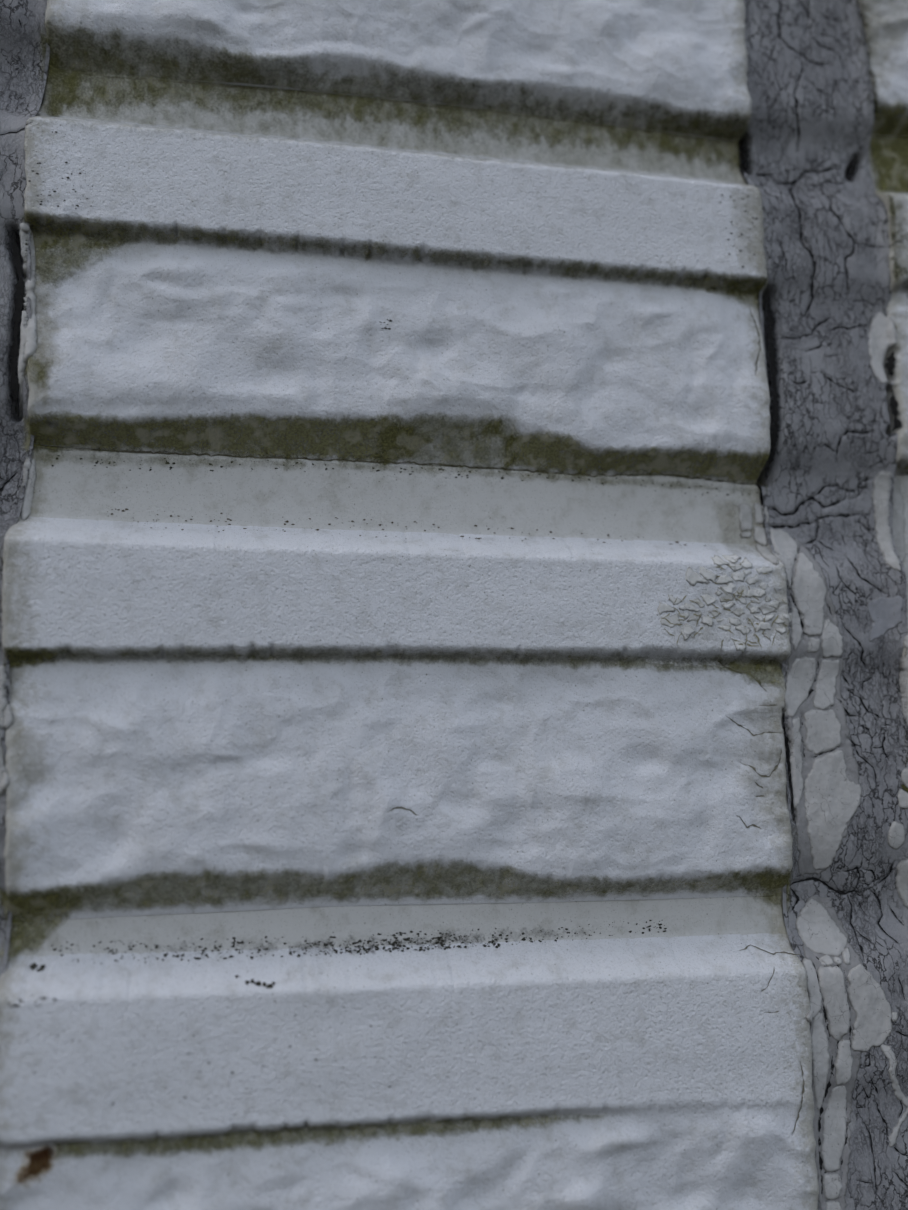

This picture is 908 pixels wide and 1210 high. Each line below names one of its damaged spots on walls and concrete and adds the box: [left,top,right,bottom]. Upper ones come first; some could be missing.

crack [9,232,25,414]
peeling [868,312,897,384]
crack [48,0,908,829]
damp [356,416,769,496]
peeling [872,471,906,572]
peeling [867,596,908,724]
damp [1,889,613,972]
damp [736,871,789,906]
damp [235,975,276,988]
crack [739,864,908,1202]
peeling [795,896,898,1210]
rust [17,1146,55,1183]